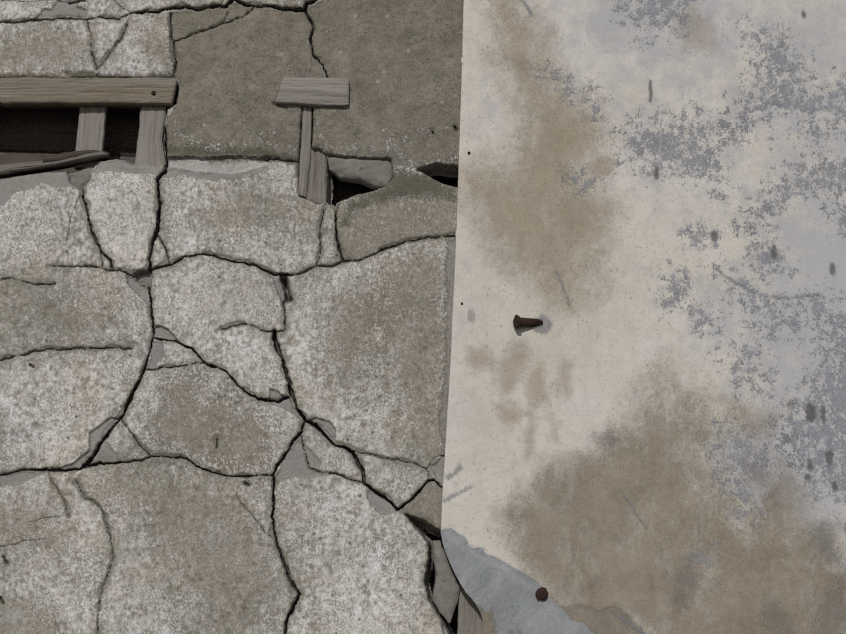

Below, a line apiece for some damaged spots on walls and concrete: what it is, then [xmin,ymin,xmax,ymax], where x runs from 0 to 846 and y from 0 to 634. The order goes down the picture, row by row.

crack [0,0,328,78]
crack [0,128,455,634]
flaking render [93,0,595,634]
water stain [469,3,610,305]
peeling [536,59,613,121]
peeling [613,0,696,48]
water stain [507,400,846,634]
peeling [611,26,846,529]